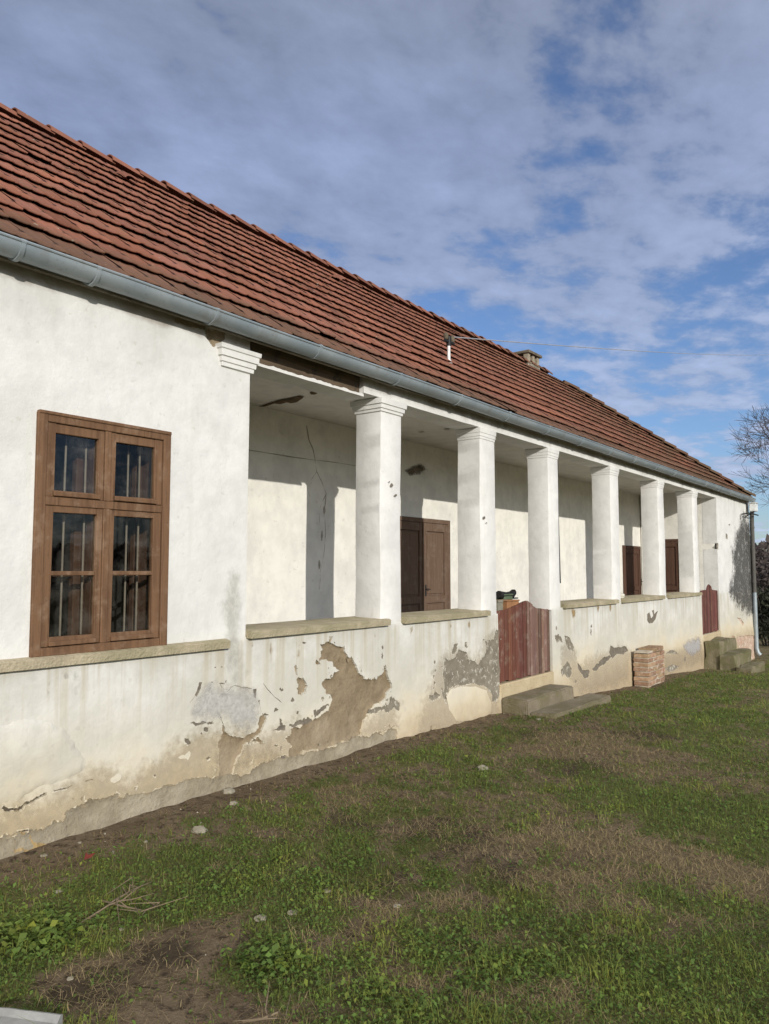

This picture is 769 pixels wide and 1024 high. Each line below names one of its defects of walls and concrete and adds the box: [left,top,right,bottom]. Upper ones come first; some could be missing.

spalling [257,344,360,407]
crack [249,426,356,589]
damp [729,514,753,615]
spalling [429,628,501,703]
spalling [555,626,628,683]
spalling [0,642,400,860]
crack [2,779,92,836]